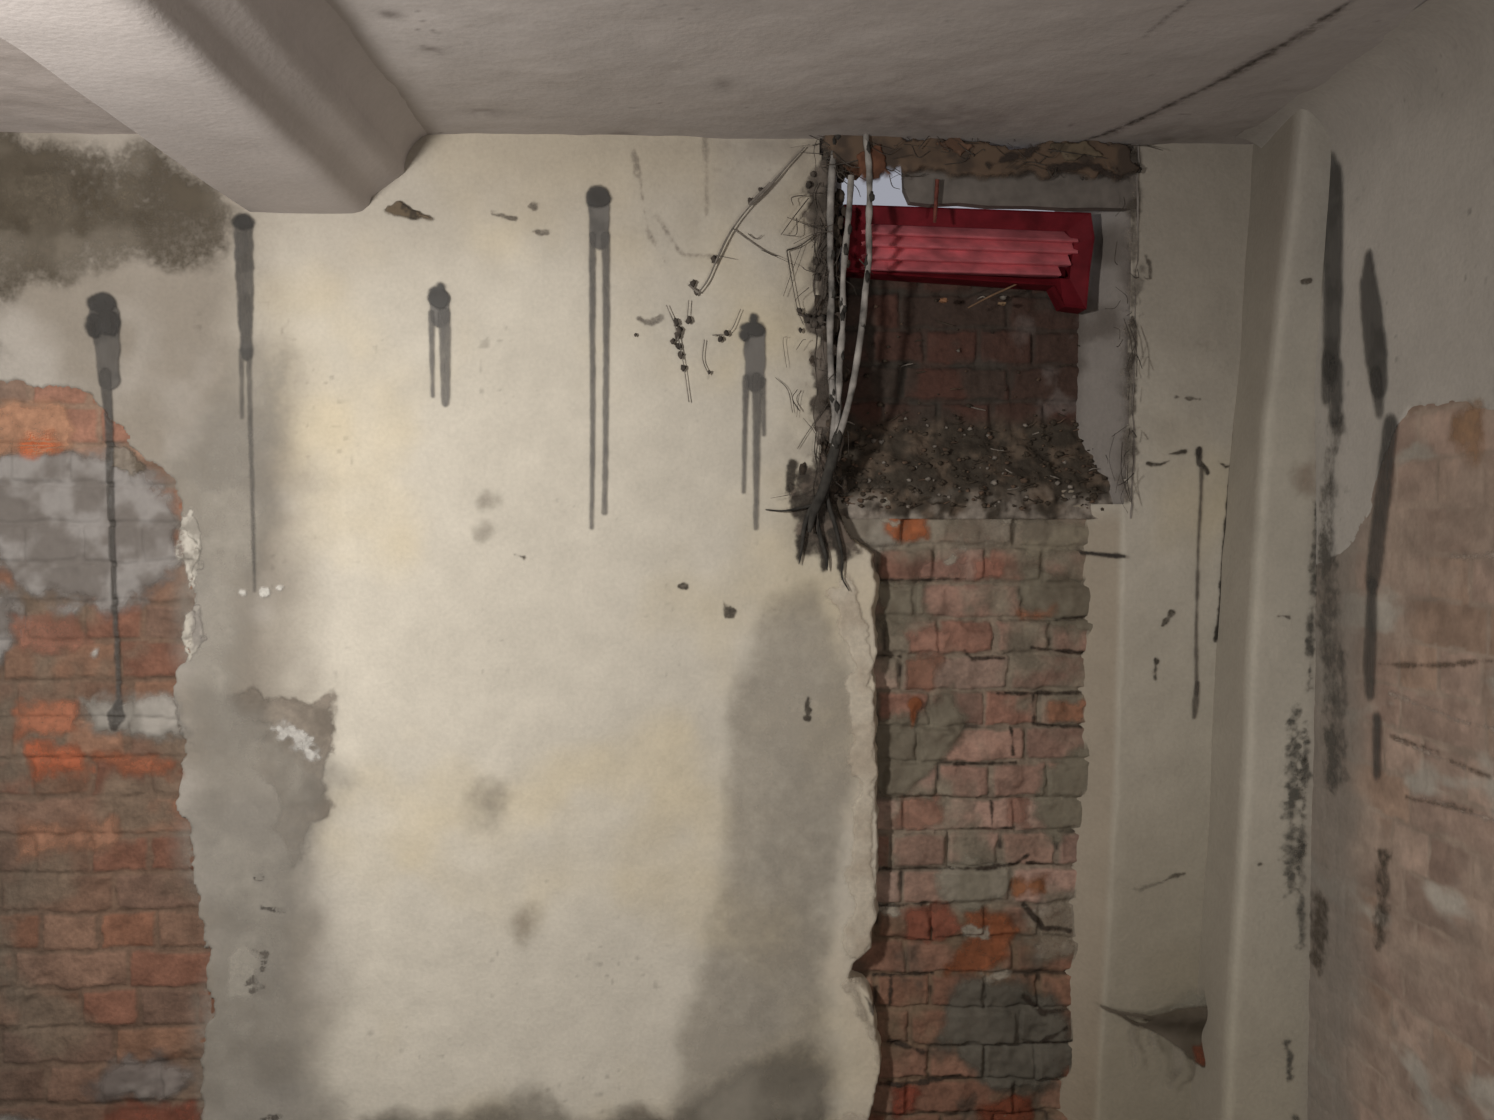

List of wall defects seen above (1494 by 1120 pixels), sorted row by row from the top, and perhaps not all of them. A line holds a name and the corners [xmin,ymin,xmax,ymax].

flaking render [0,380,269,1120]
leakage [0,132,336,1120]
leakage [428,283,450,406]
leakage [586,186,611,529]
leakage [739,313,765,529]
flaking render [827,490,1093,1120]
flaking render [823,135,1140,182]
crack [1208,4,1347,87]
leakage [1284,470,1344,972]
leakage [1322,154,1343,452]
leakage [1360,251,1398,777]
flaking render [1307,400,1494,1120]